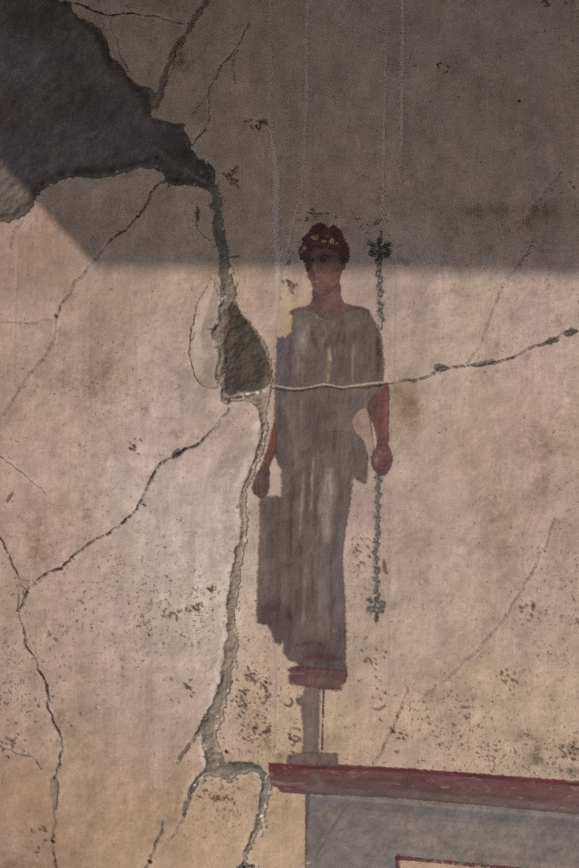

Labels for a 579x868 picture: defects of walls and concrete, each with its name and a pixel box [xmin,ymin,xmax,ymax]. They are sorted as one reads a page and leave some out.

crack [73,0,208,109]
crack [193,23,249,143]
crack [1,179,166,415]
flaking render [0,0,273,868]
crack [188,286,217,381]
crack [270,171,577,391]
crack [0,409,229,779]
crack [145,788,193,868]